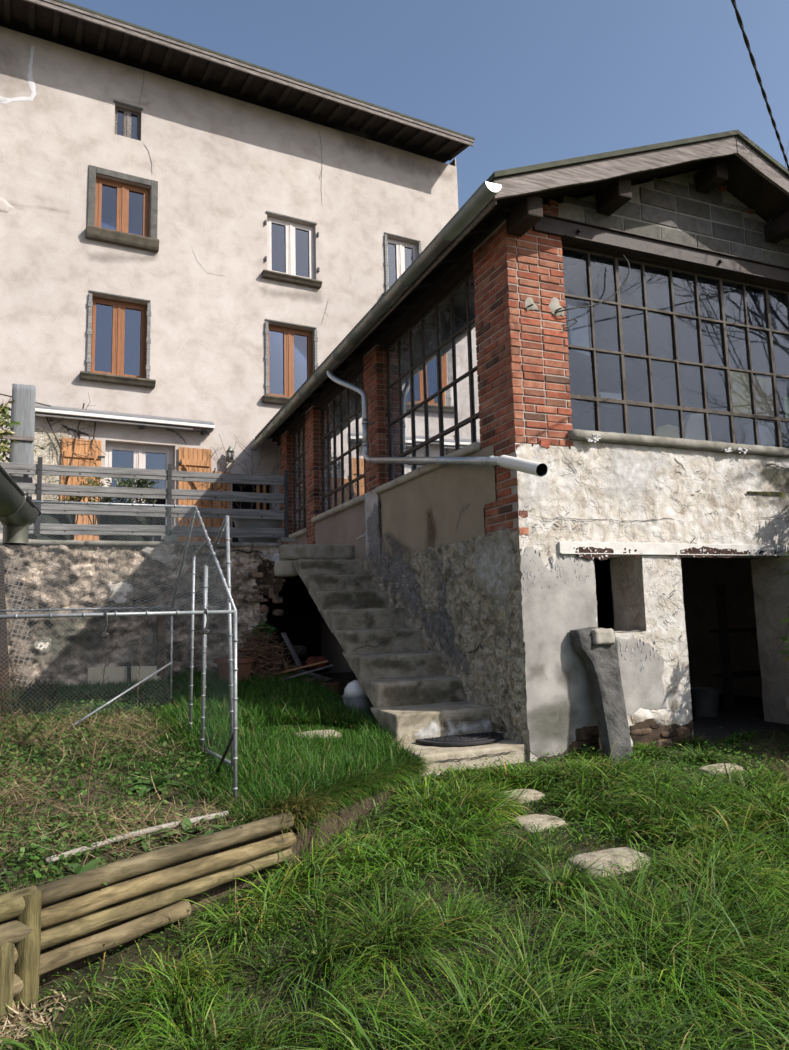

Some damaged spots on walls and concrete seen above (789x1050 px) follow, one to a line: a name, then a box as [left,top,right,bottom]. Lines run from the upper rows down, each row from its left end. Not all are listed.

crack [0,46,36,104]
leakage [760,461,789,494]
peeling [574,546,642,560]
peeling [675,546,782,558]
flaking render [630,718,693,748]